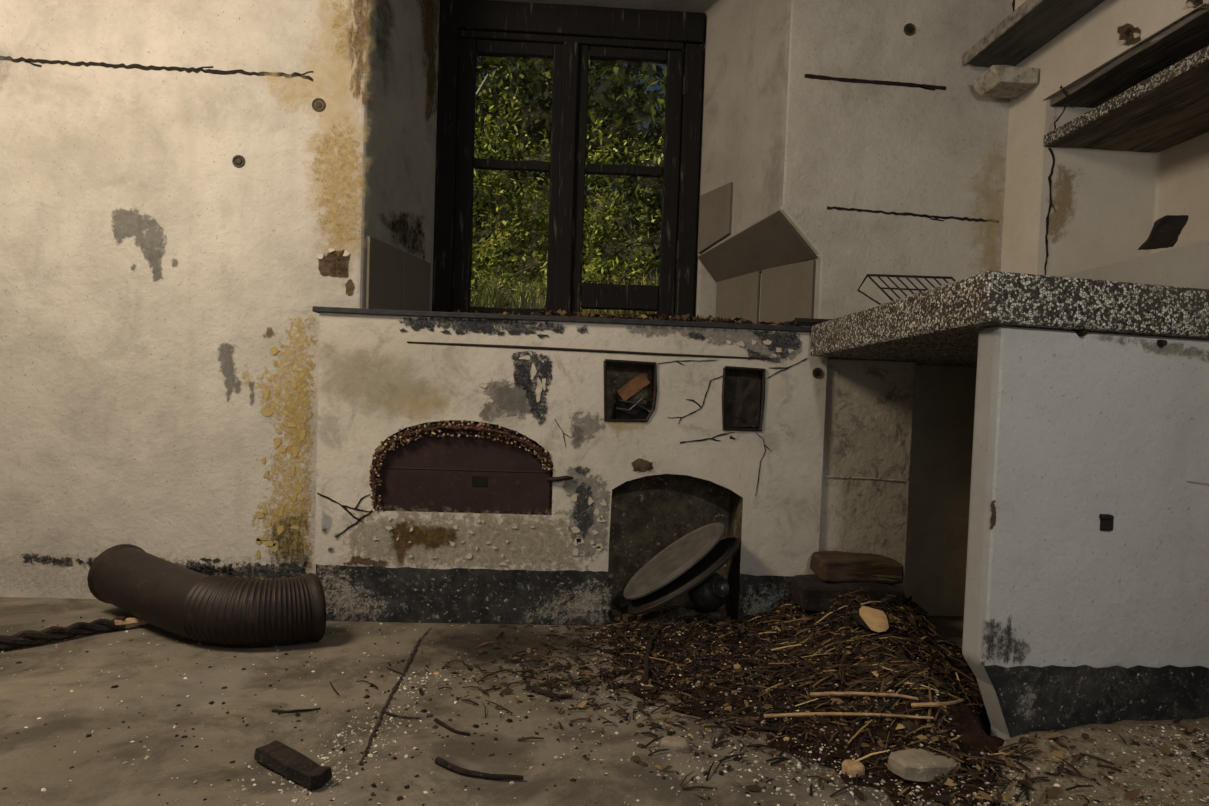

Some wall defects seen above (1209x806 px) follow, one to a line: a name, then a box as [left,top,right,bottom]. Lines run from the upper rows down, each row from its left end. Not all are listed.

crack [0,56,313,82]
crack [1044,85,1074,275]
flaking render [316,248,355,296]
crack [766,358,807,379]
flaking render [162,317,610,579]
crack [658,360,771,496]
peeling [20,554,96,568]
water stain [982,618,1029,666]